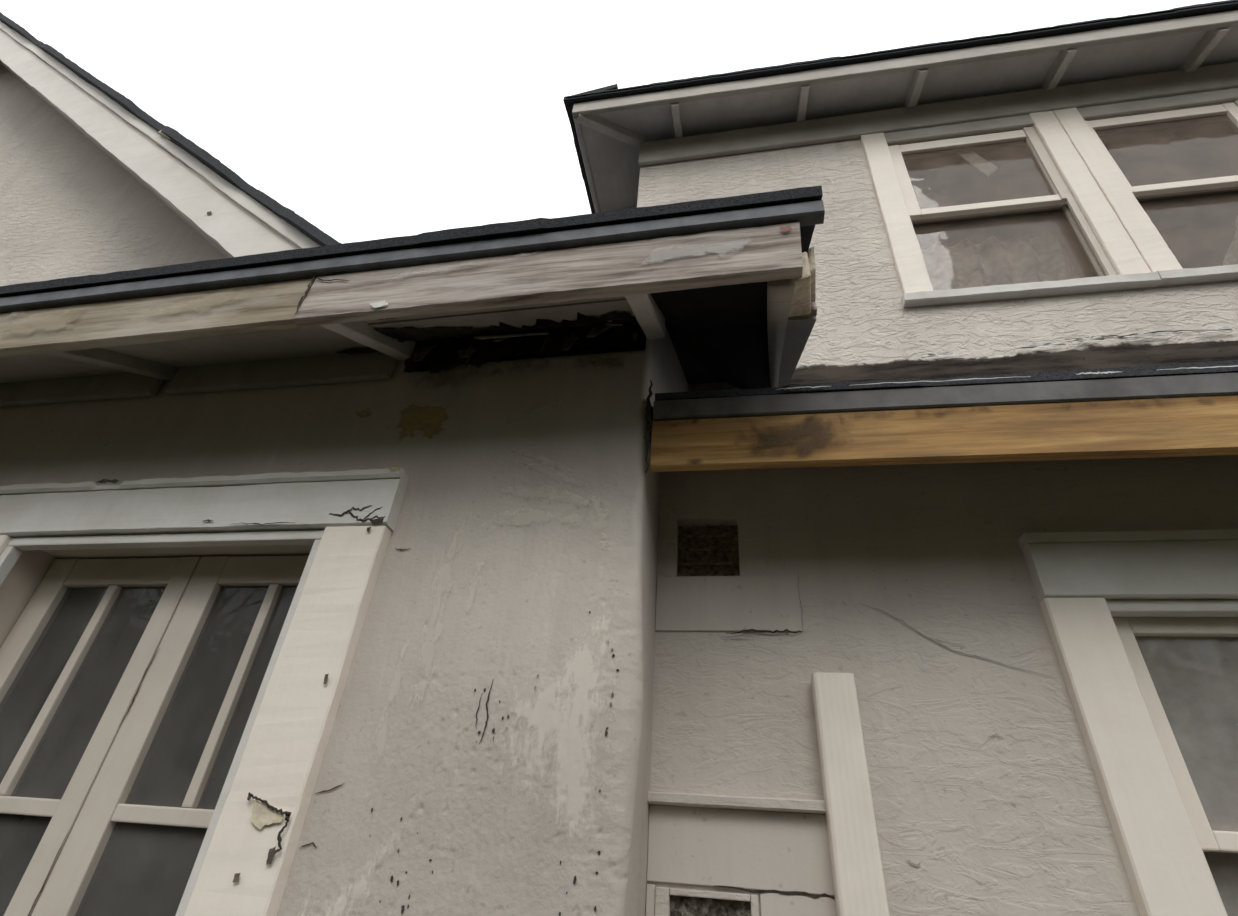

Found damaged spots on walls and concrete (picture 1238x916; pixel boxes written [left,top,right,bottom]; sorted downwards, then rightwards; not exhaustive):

peeling [643,240,748,264]
hole [415,311,639,343]
crack [330,505,411,550]
crack [726,570,803,638]
crack [859,603,1057,679]
spalling [247,792,291,865]
peeling [301,817,403,916]
crack [714,885,835,899]